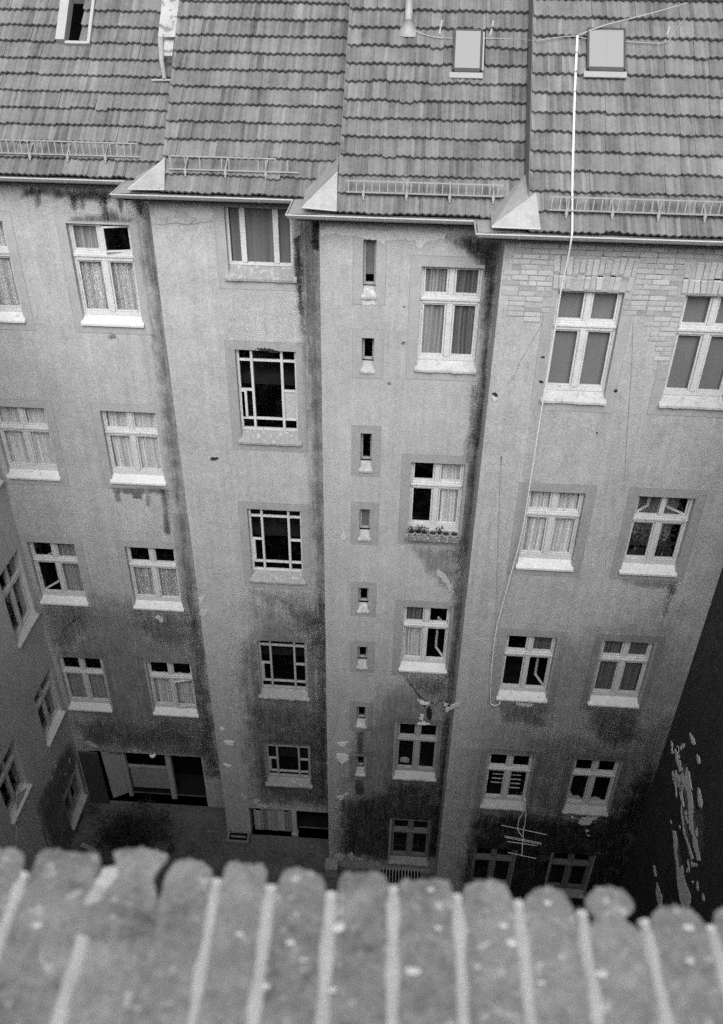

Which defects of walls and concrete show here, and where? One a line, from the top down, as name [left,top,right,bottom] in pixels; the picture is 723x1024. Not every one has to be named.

leakage [25,188,144,221]
leakage [294,221,319,315]
leakage [433,238,496,854]
peeling [670,733,705,909]
peeling [653,865,662,907]